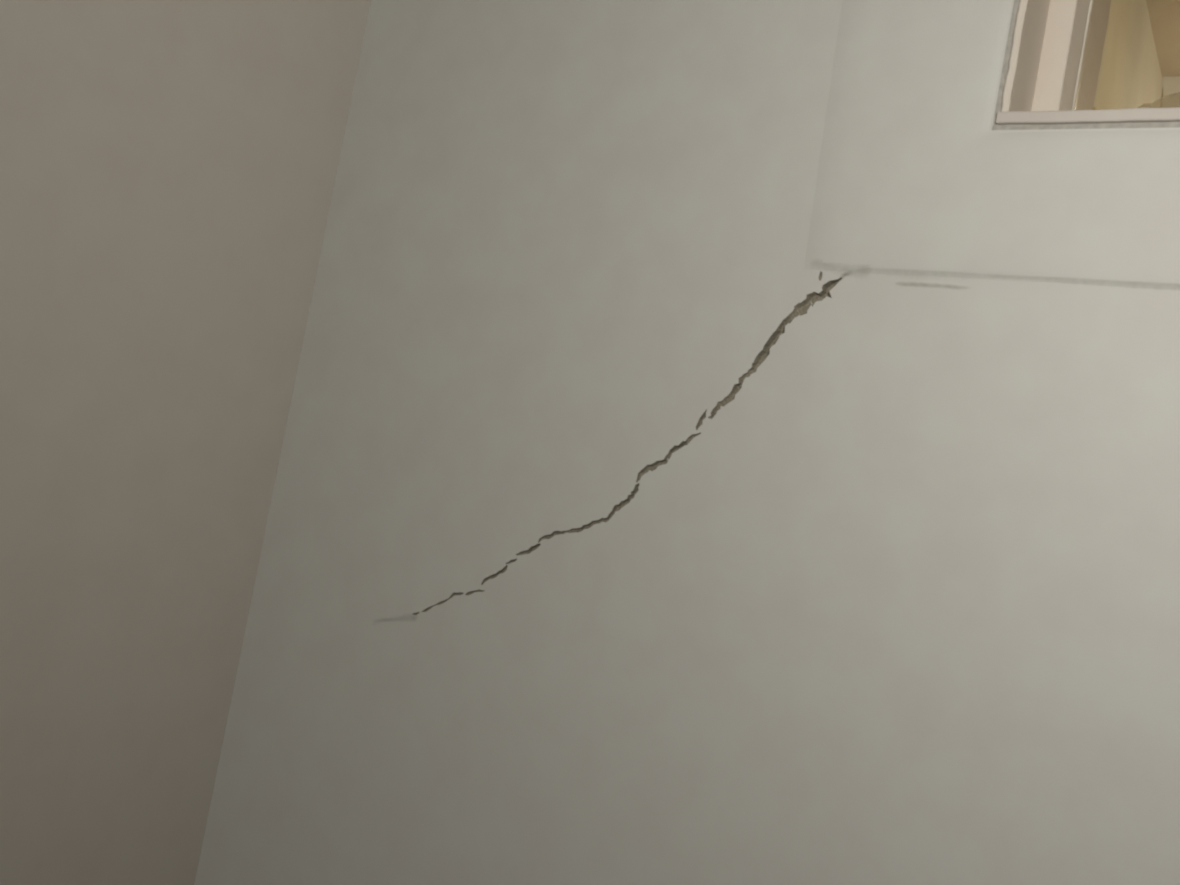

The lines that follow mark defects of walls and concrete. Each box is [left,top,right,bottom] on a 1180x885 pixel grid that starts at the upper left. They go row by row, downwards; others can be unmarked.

crack [992,0,1180,130]
crack [412,272,842,615]